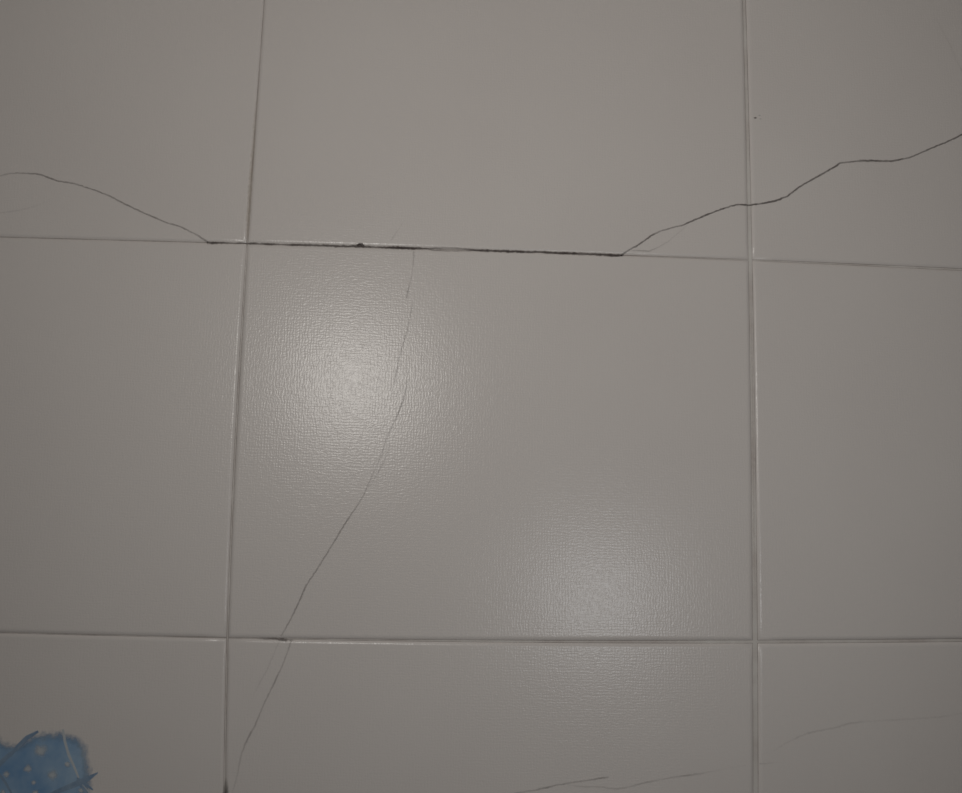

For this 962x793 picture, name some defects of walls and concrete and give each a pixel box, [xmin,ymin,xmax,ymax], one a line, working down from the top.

crack [700,164,838,218]
crack [325,242,422,250]
crack [477,249,622,257]